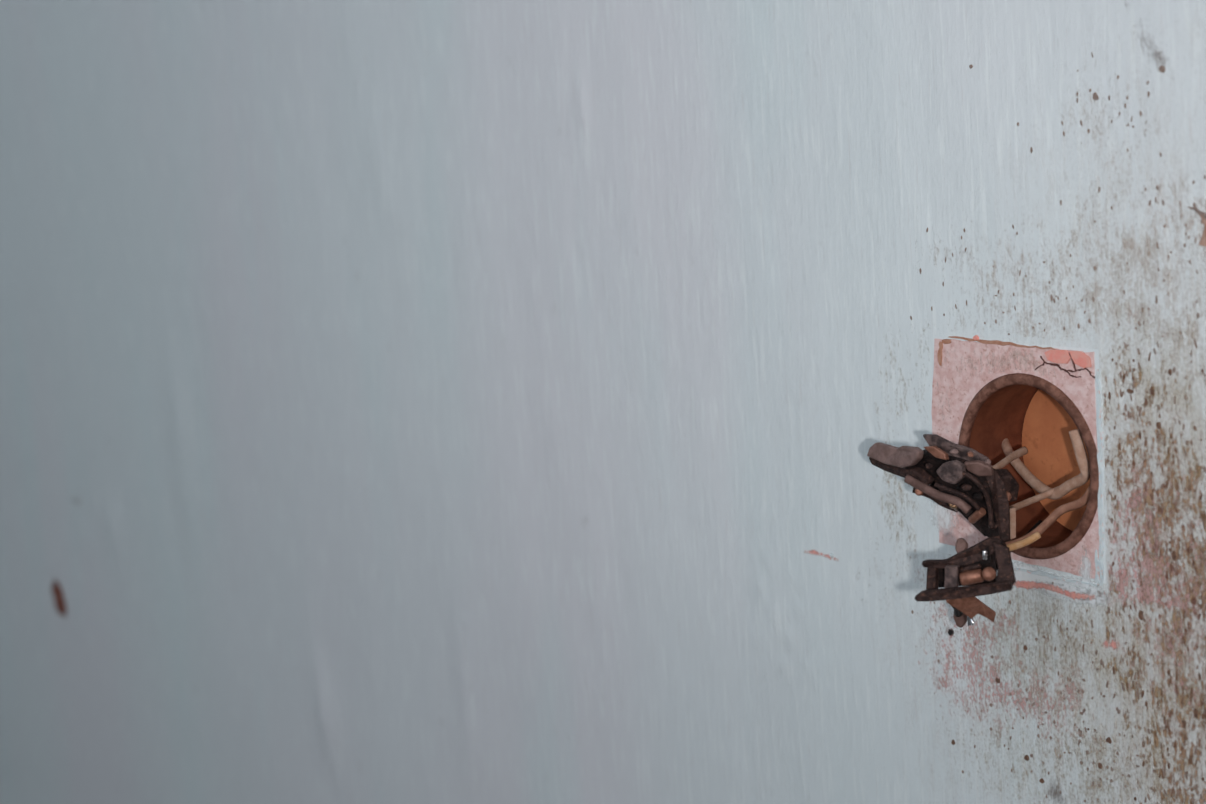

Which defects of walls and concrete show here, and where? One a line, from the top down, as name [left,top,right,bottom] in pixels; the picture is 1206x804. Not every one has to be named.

flaking render [931,335,1204,628]
damp [1015,581,1092,599]
peeling [939,615,1074,723]